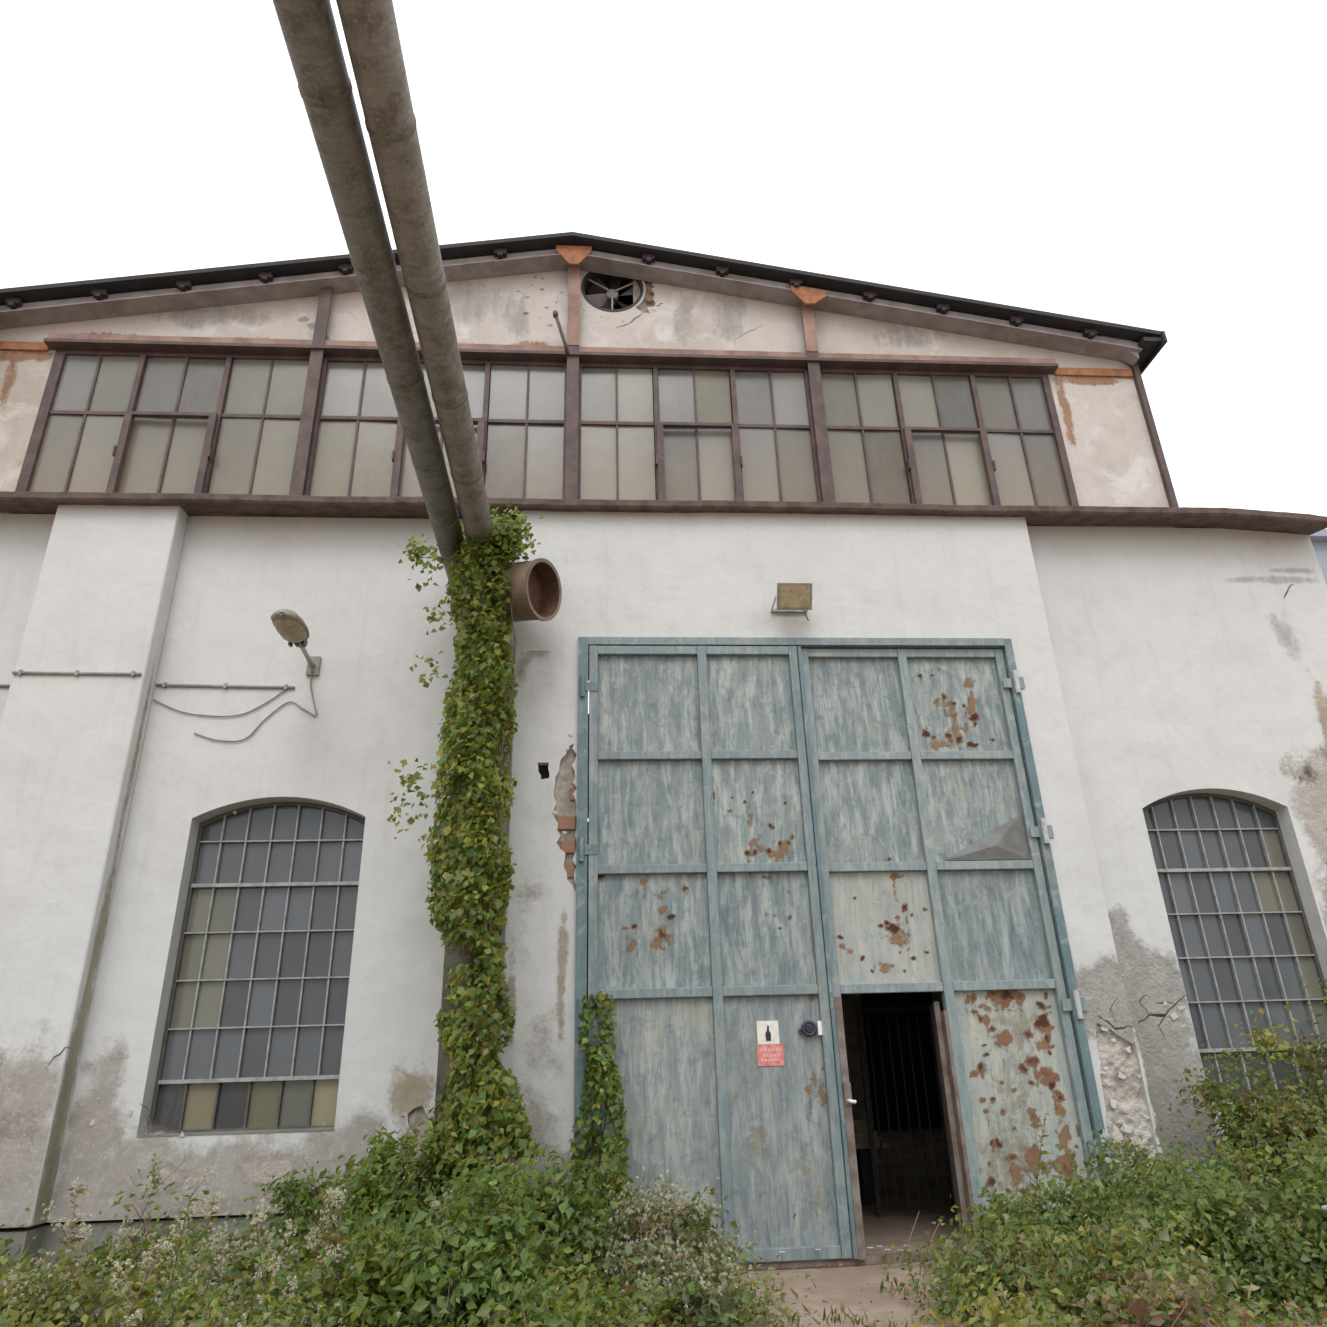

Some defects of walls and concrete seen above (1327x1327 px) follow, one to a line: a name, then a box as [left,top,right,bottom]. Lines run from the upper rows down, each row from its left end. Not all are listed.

corrosion [922,678,995,751]
spalling [538,732,577,890]
corrosion [640,879,676,950]
corrosion [728,791,803,881]
corrosion [837,857,929,973]
peeling [1295,748,1327,925]
leakage [0,1056,56,1228]
leakage [51,1052,388,1221]
leakage [391,1072,434,1173]
corrosion [965,990,1080,1200]
crack [1098,995,1185,1040]
peeling [1076,910,1223,1185]